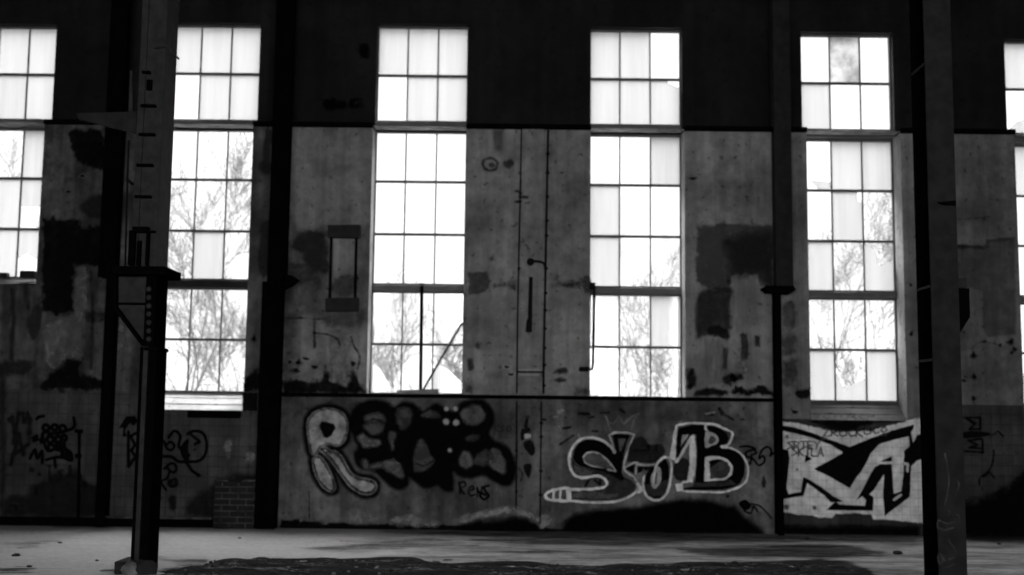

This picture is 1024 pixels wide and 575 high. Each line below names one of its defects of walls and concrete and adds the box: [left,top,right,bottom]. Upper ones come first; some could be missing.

leakage [68,128,104,170]
leakage [0,195,105,527]
leakage [686,223,773,397]